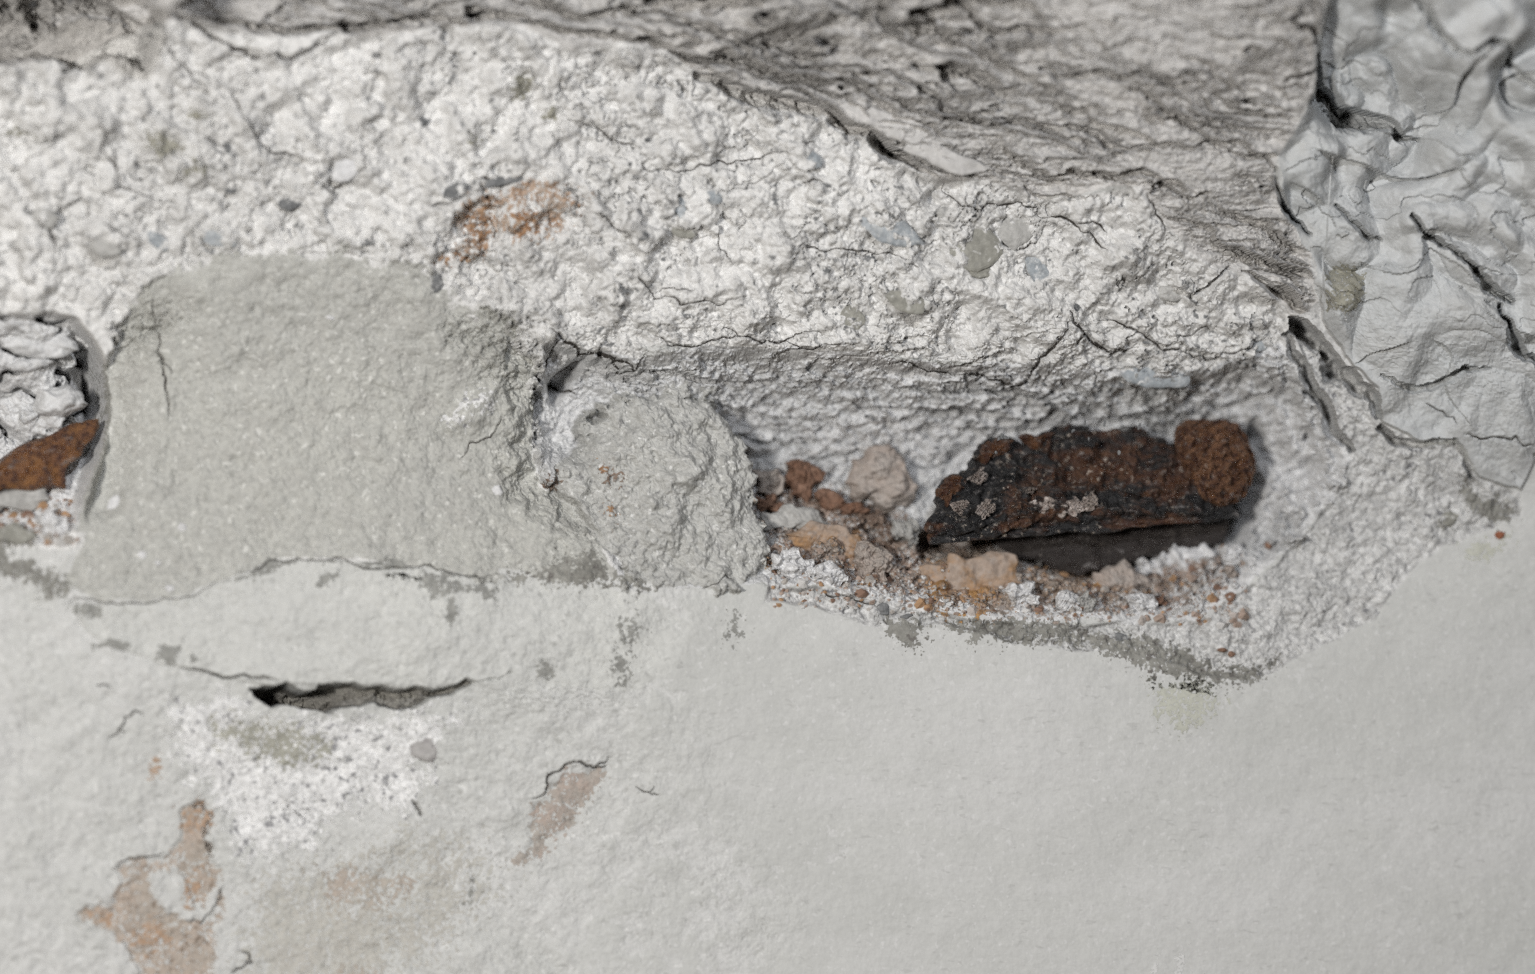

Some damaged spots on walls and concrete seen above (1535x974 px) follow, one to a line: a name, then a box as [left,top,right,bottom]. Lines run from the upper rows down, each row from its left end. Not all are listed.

crack [163,14,367,193]
crack [568,119,824,191]
corrosion [433,174,595,268]
crack [941,186,1109,251]
crack [545,213,856,396]
spalling [0,0,1522,682]
crack [895,310,1277,387]
corrosion [0,419,99,491]
corrosion [542,469,563,493]
corrosion [975,432,1055,465]
corrosion [752,468,1228,625]
crack [182,668,471,713]